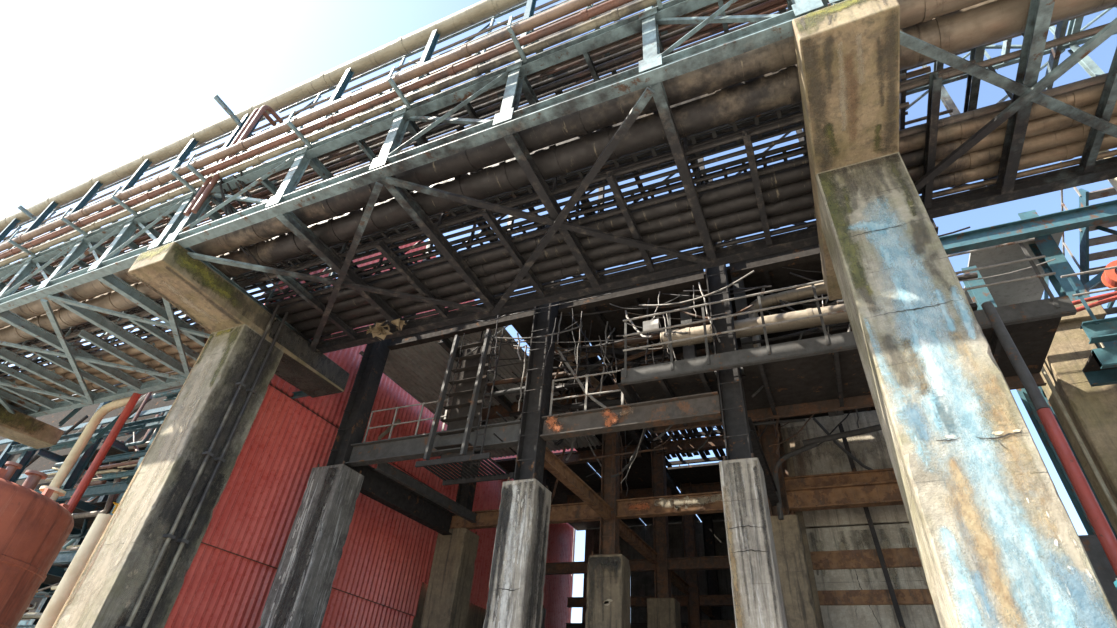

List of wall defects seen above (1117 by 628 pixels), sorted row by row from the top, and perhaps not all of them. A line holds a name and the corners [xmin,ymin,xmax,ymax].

leakage [803,15,900,179]
leakage [66,267,349,628]
rust [546,417,560,431]
rust [603,409,626,427]
crack [937,429,1024,448]
leakage [848,197,1114,628]
leakage [484,485,512,628]
leakage [526,486,548,628]
leakage [754,467,778,624]